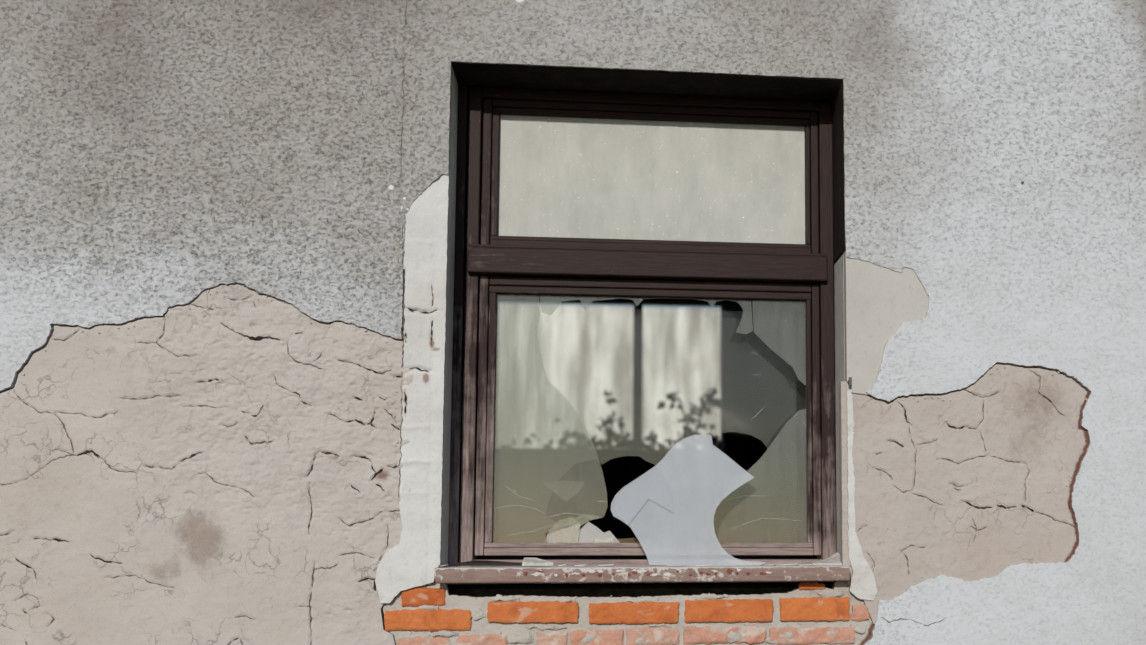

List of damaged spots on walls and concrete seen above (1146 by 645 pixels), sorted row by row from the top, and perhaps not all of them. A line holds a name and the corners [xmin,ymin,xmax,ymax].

crack [0,220,437,645]
spalling [0,168,1087,645]
crack [876,390,1076,539]